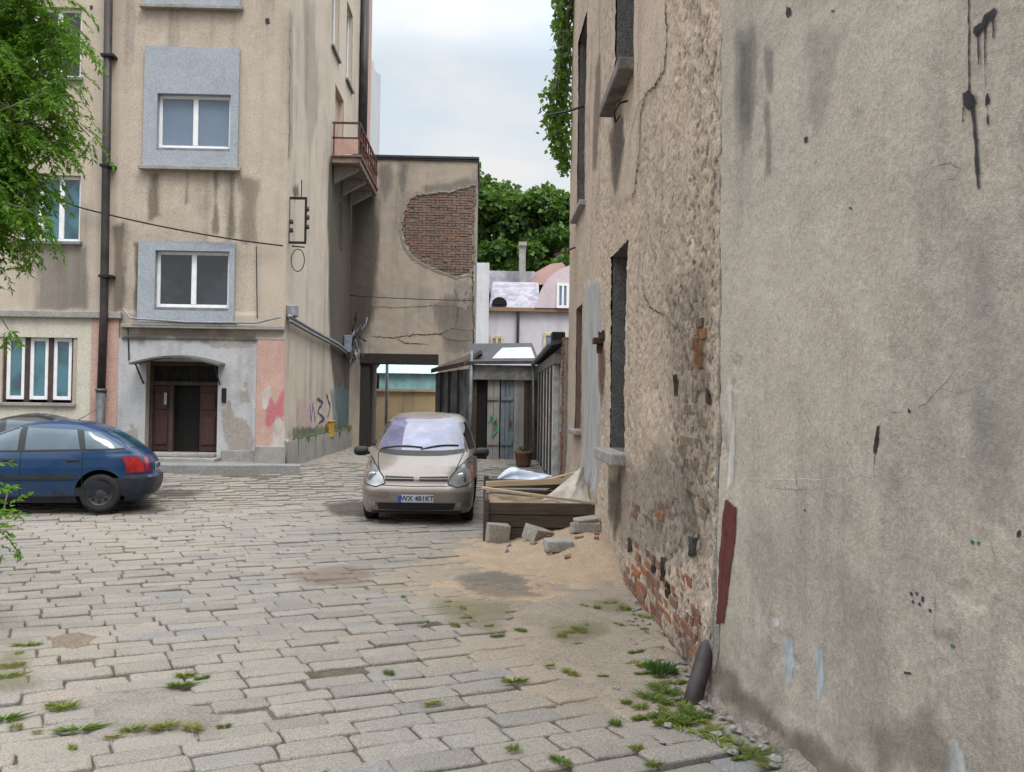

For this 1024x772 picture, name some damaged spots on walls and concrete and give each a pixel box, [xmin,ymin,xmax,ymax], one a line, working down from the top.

crack [375,271,475,345]
spalling [398,183,477,310]
peeling [272,417,284,446]
spalling [623,285,721,673]